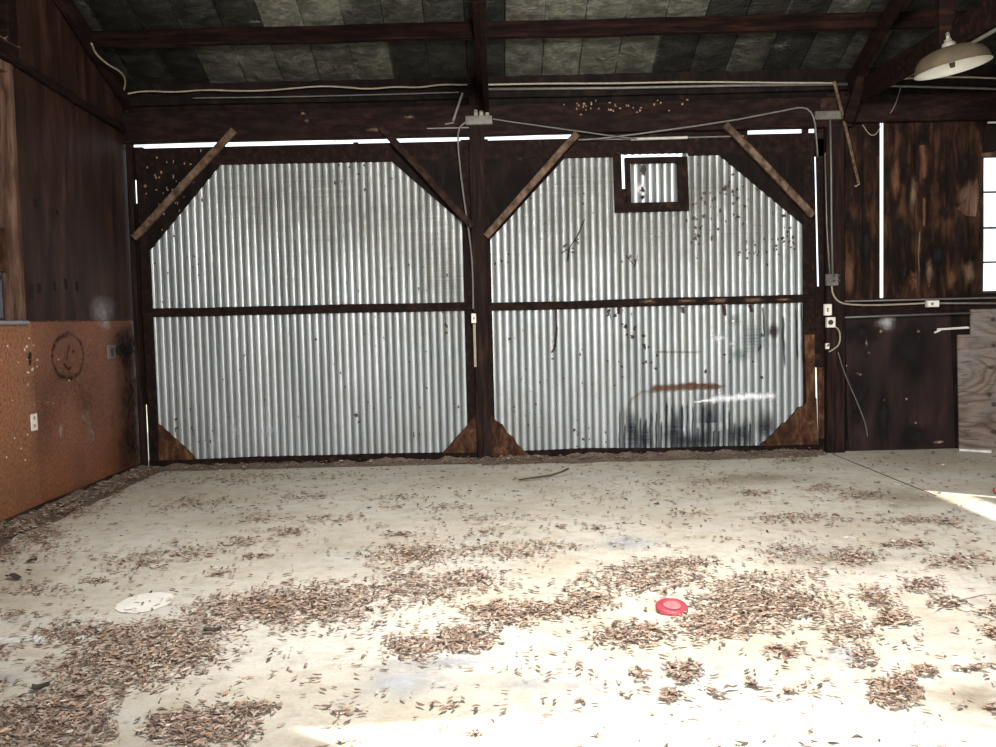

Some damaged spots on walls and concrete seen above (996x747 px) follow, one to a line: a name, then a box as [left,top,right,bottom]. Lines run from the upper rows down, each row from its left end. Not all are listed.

rust [652,383,722,391]
water stain [619,393,776,448]